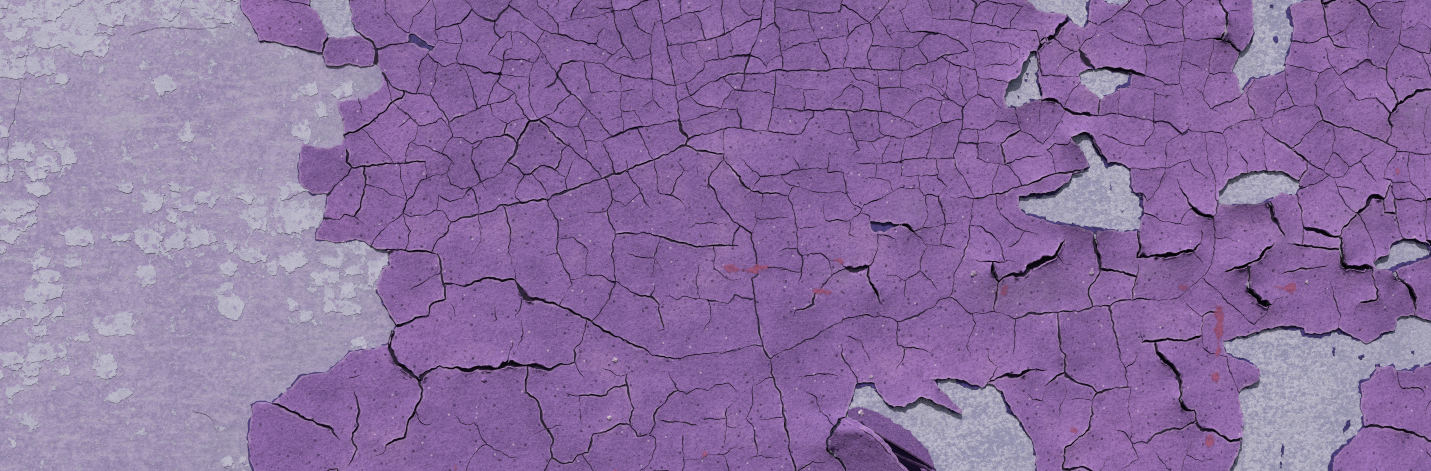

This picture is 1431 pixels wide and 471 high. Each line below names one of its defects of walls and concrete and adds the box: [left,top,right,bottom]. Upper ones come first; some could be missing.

peeling [0,0,461,471]
crack [323,0,1431,471]
peeling [970,0,1431,277]
crack [273,375,360,471]
peeling [828,378,1037,471]
peeling [1155,310,1431,471]